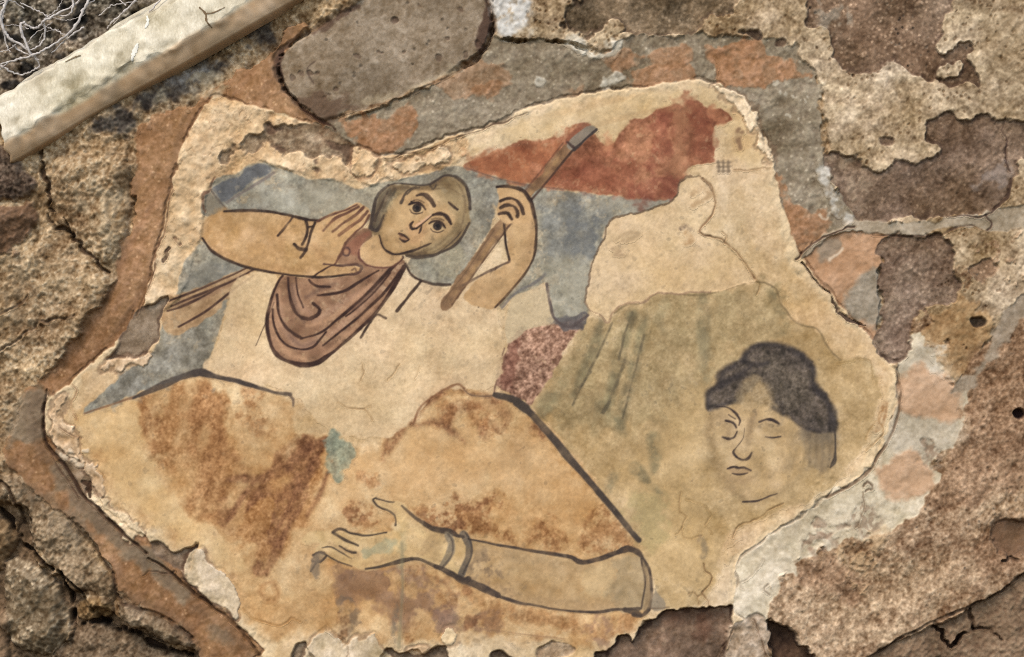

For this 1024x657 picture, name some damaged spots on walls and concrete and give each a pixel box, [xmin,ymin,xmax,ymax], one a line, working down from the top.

spalling [805,0,981,88]
crack [38,149,111,275]
flaking render [393,147,452,174]
spalling [824,112,1024,223]
flaking render [49,395,241,620]
spalling [766,619,814,657]
crack [867,555,1024,657]